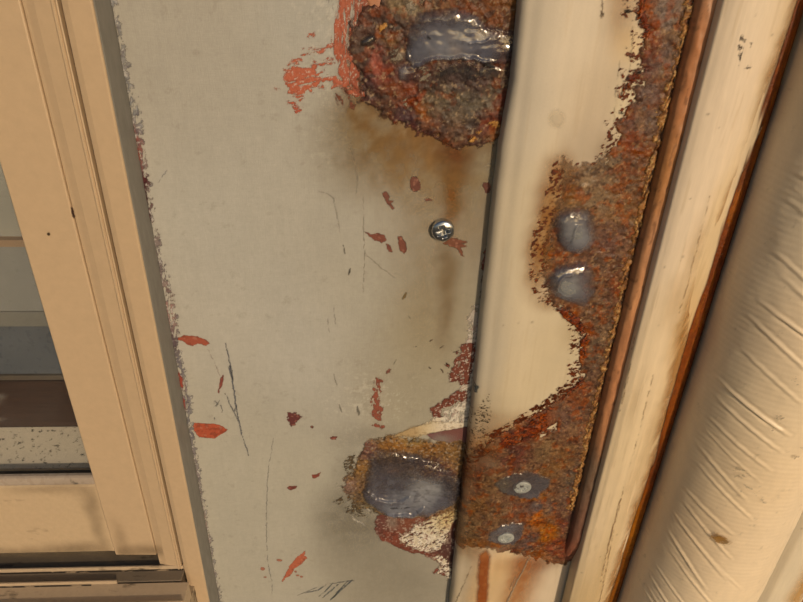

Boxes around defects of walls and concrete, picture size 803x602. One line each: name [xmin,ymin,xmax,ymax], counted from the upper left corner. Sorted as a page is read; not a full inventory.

peeling [410,177,421,192]
peeling [366,232,407,253]
peeling [443,238,467,257]
peeling [111,0,227,600]
corrosion [336,0,694,602]
peeling [395,296,481,443]
peeling [277,551,307,582]